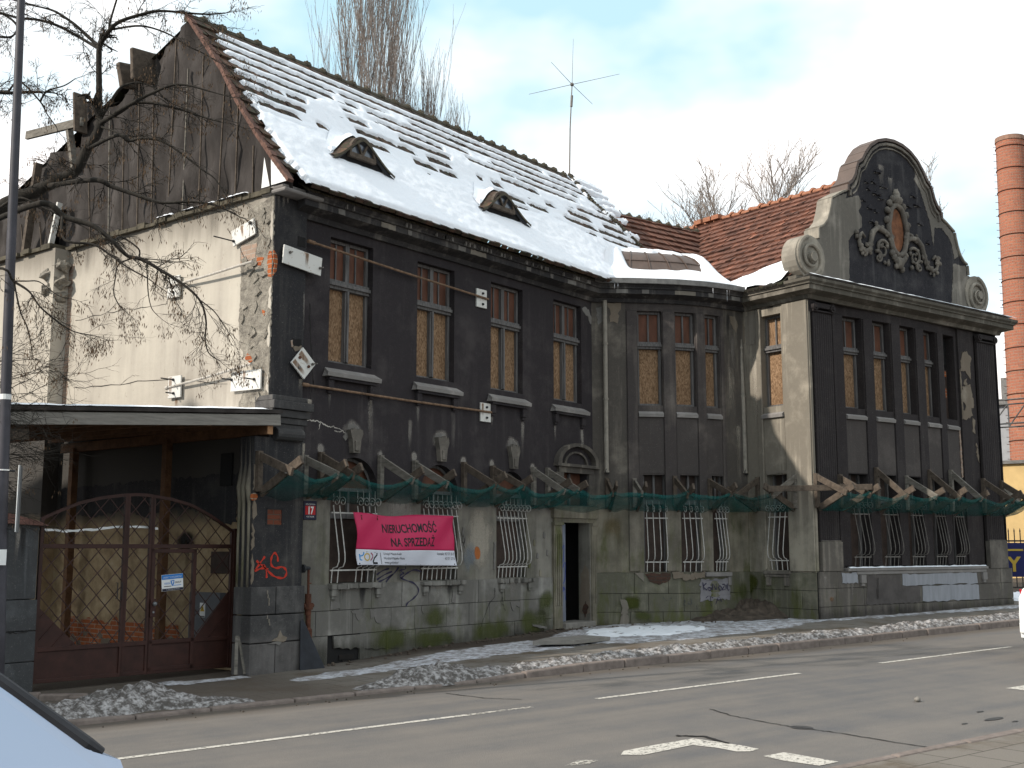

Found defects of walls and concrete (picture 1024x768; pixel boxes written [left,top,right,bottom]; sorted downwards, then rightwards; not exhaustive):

flaking render [238,194,278,408]
flaking render [914,174,970,307]
flaking render [959,351,980,478]